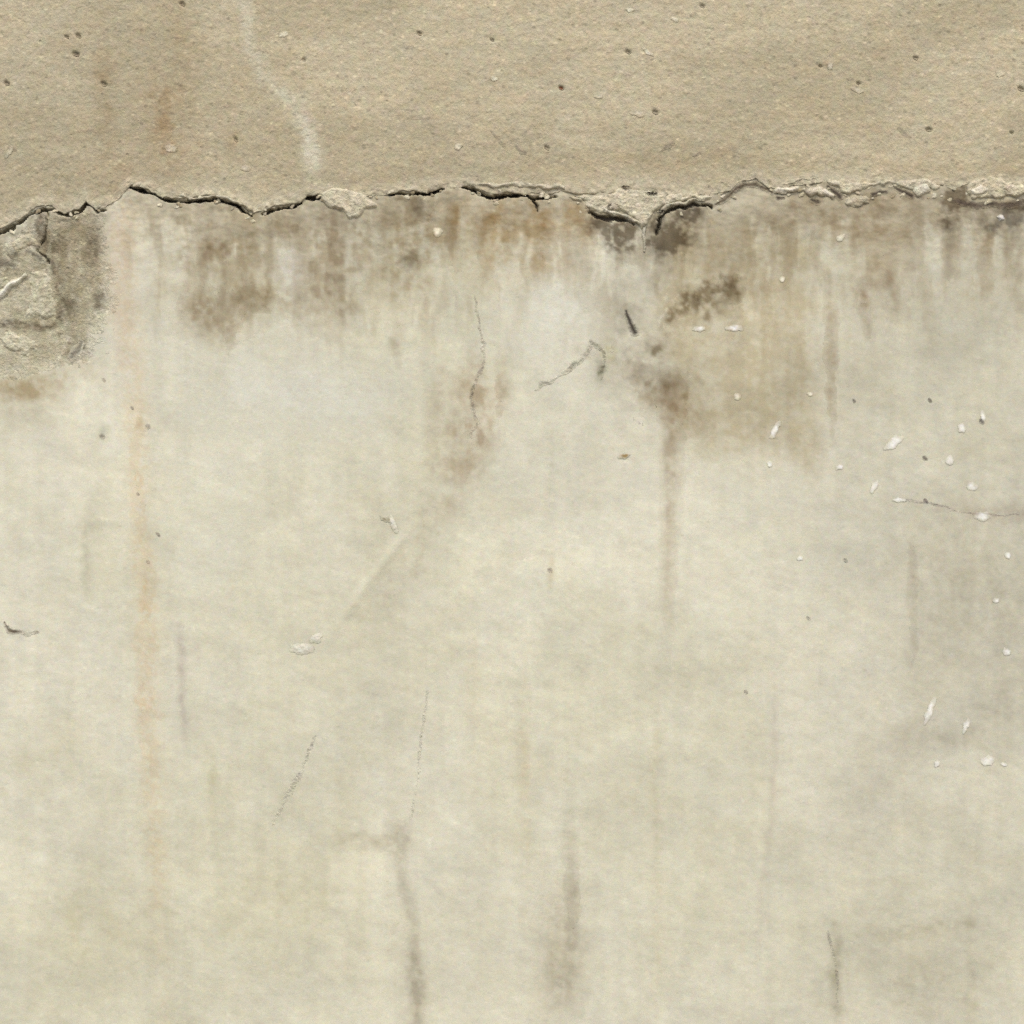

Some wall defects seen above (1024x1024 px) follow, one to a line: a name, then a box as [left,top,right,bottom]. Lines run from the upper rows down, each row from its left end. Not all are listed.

crack [129,187,320,215]
crack [388,187,556,208]
crack [589,212,626,222]
crack [656,181,844,235]
crack [870,187,915,199]
crack [950,198,1024,210]
spalling [0,207,122,381]
crack [470,295,486,438]
crack [535,340,606,391]
leakage [131,140,1024,1024]